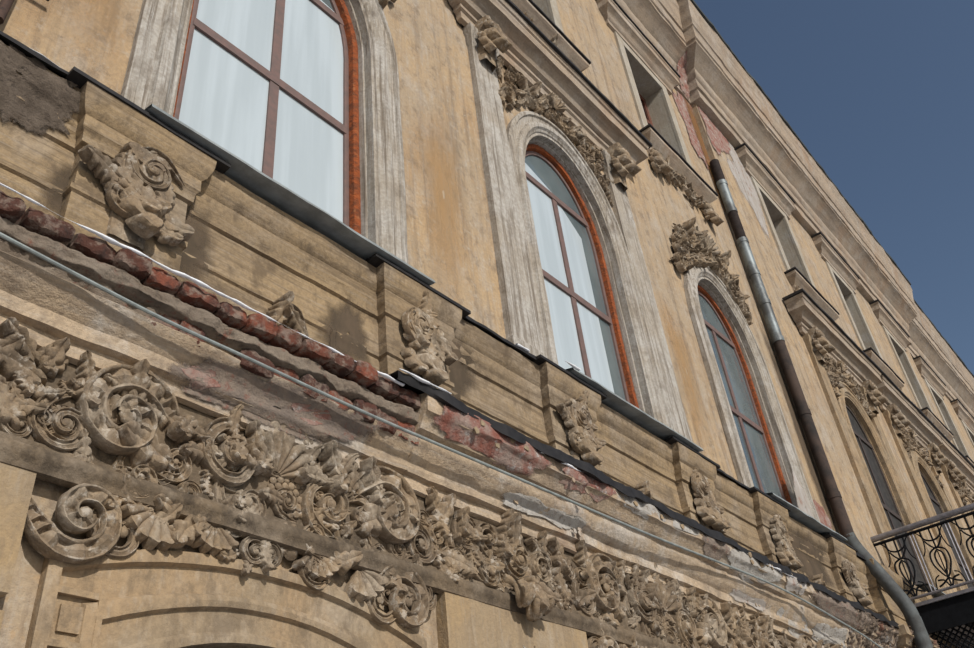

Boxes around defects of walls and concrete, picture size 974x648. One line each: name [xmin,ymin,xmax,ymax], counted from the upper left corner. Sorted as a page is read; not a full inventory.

spalling [0,40,81,136]
flaking render [672,51,753,209]
flaking render [0,190,421,445]
spalling [433,405,551,476]
spalling [502,492,586,537]
spalling [559,466,916,648]